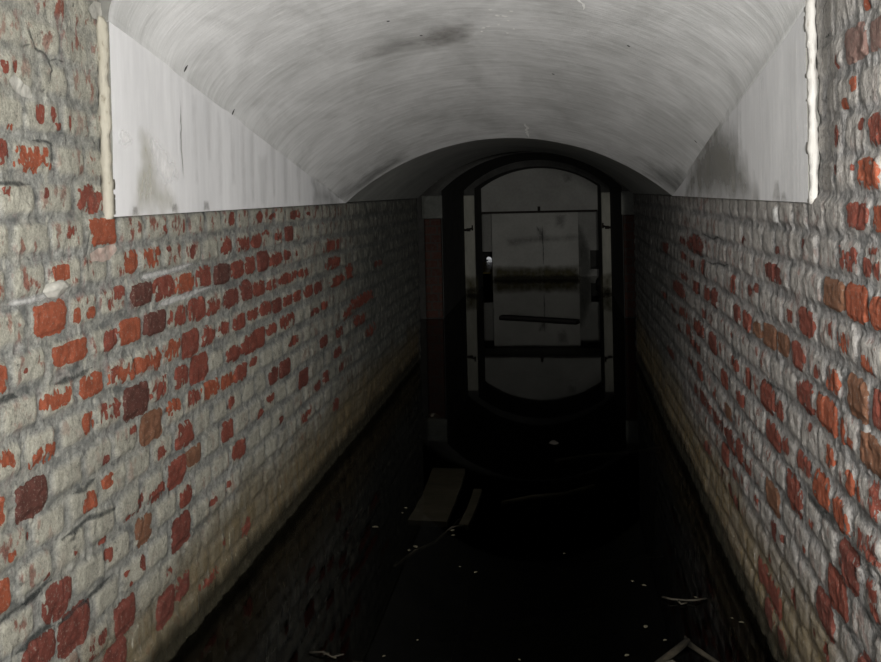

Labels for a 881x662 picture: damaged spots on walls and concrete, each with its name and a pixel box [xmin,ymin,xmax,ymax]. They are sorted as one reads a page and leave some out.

peeling [0,59,17,74]
peeling [835,0,881,110]
peeling [36,104,71,131]
peeling [858,111,881,147]
peeling [0,138,52,174]
leakage [691,131,746,194]
peeling [850,156,881,190]
peeling [846,202,881,233]
peeling [21,184,376,662]
peeling [661,234,881,662]
peeling [0,441,56,526]
peeling [0,577,11,615]